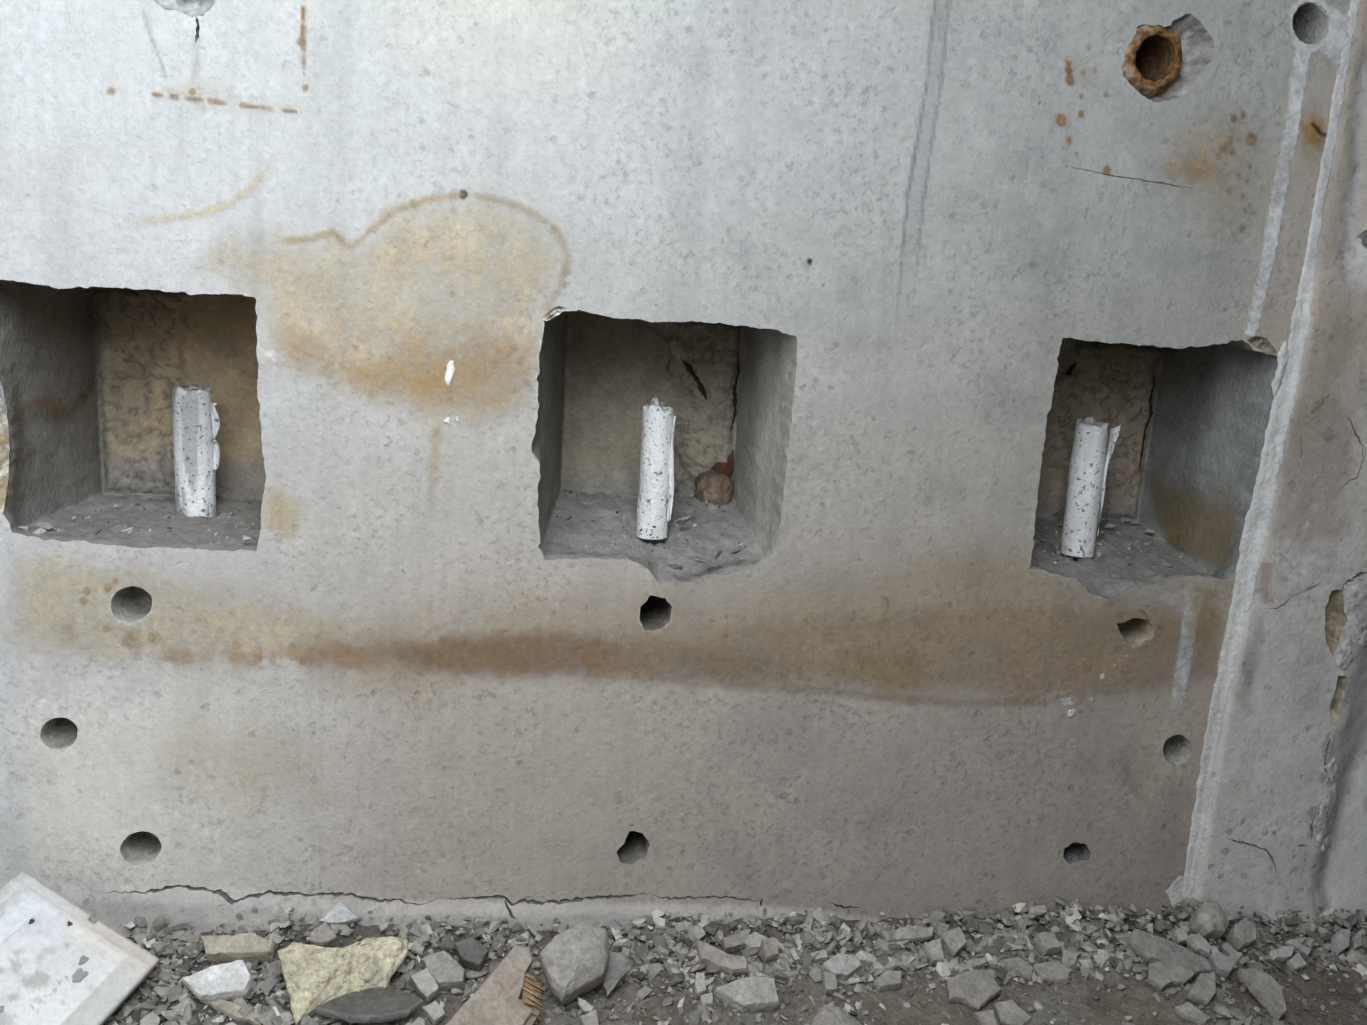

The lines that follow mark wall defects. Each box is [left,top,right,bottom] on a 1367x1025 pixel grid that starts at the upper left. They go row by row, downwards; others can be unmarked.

spalling [1354,230,1367,249]
crack [1300,396,1364,496]
crack [1264,572,1367,609]
leakage [762,589,1212,705]
spalling [1325,589,1348,657]
spalling [1330,676,1347,725]
crack [1226,733,1333,874]
crack [110,885,763,919]
crack [829,901,859,909]